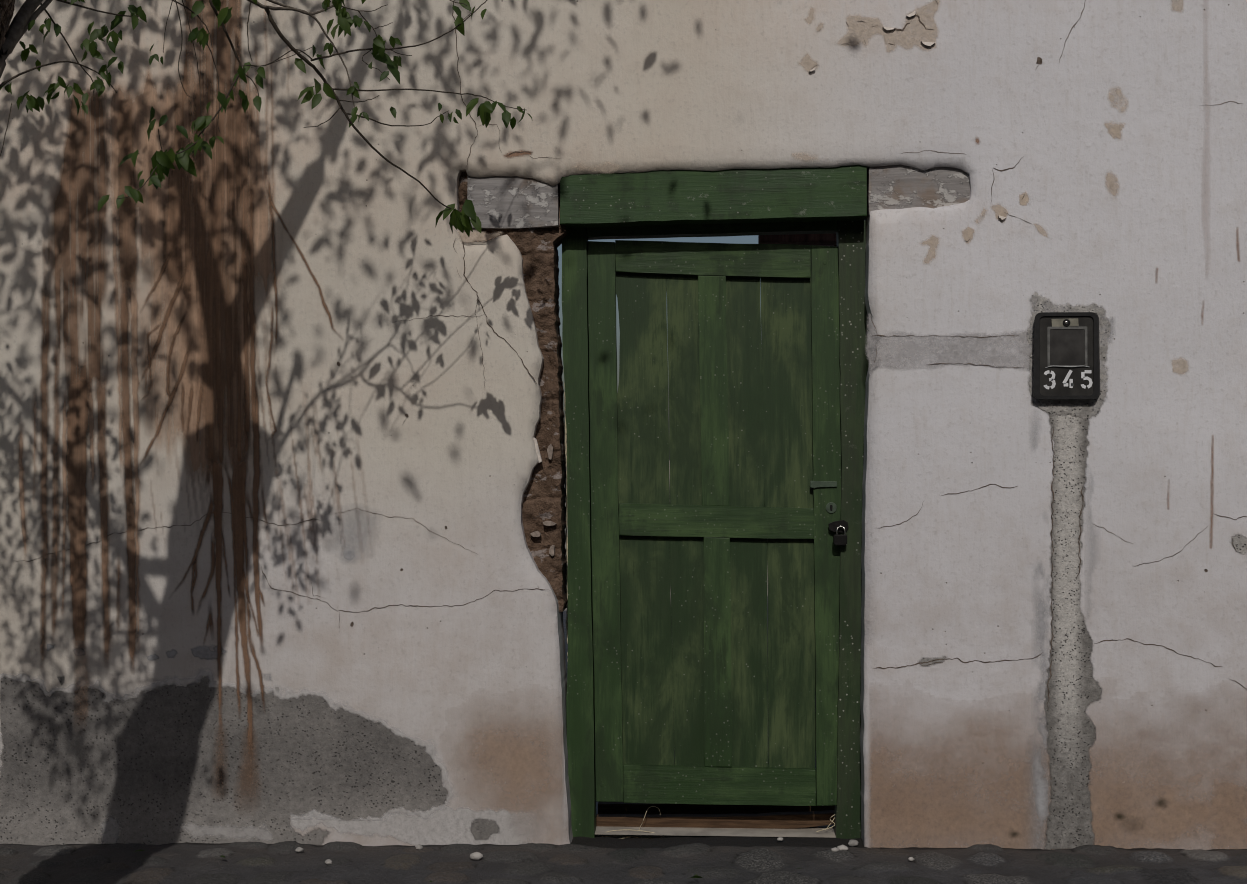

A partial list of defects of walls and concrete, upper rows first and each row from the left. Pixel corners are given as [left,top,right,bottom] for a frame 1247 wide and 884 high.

peeling [839,0,939,52]
flaking render [458,171,468,212]
crack [401,241,537,386]
damp [18,100,140,662]
flaking render [459,185,568,611]
crack [881,484,1017,528]
crack [261,567,548,628]
crack [876,653,1042,669]
crack [1098,638,1246,689]
peeling [0,646,452,846]
damp [870,742,1055,850]
damp [1088,755,1247,849]